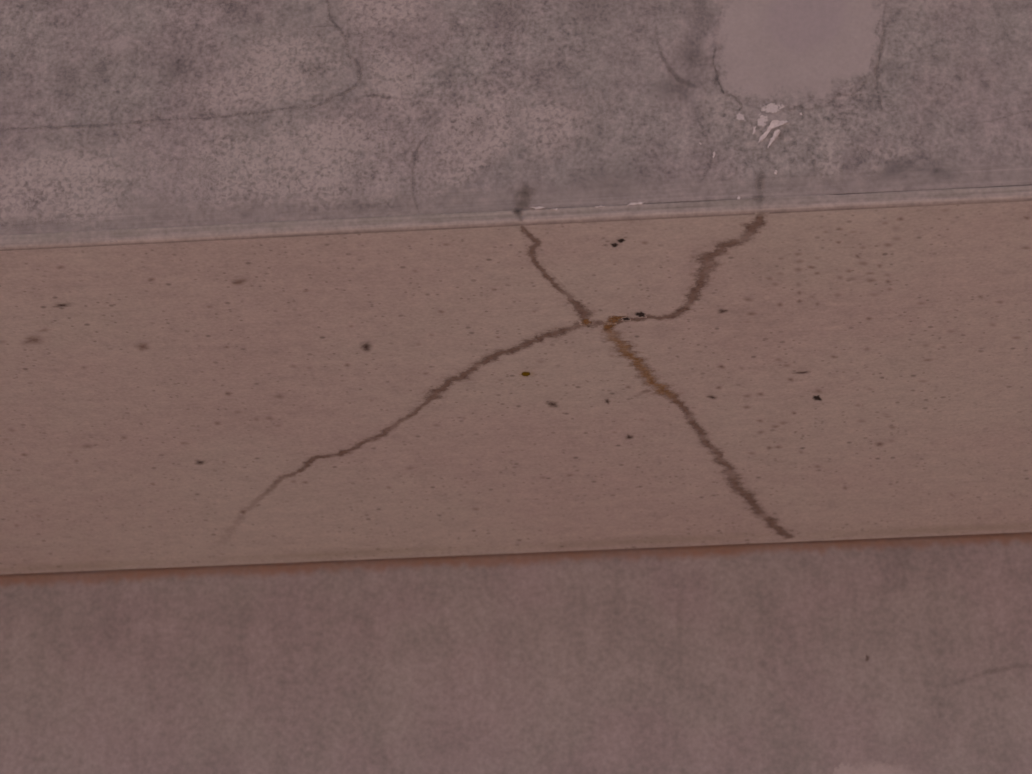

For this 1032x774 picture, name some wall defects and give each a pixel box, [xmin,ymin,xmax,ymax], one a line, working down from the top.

crack [209,212,799,545]